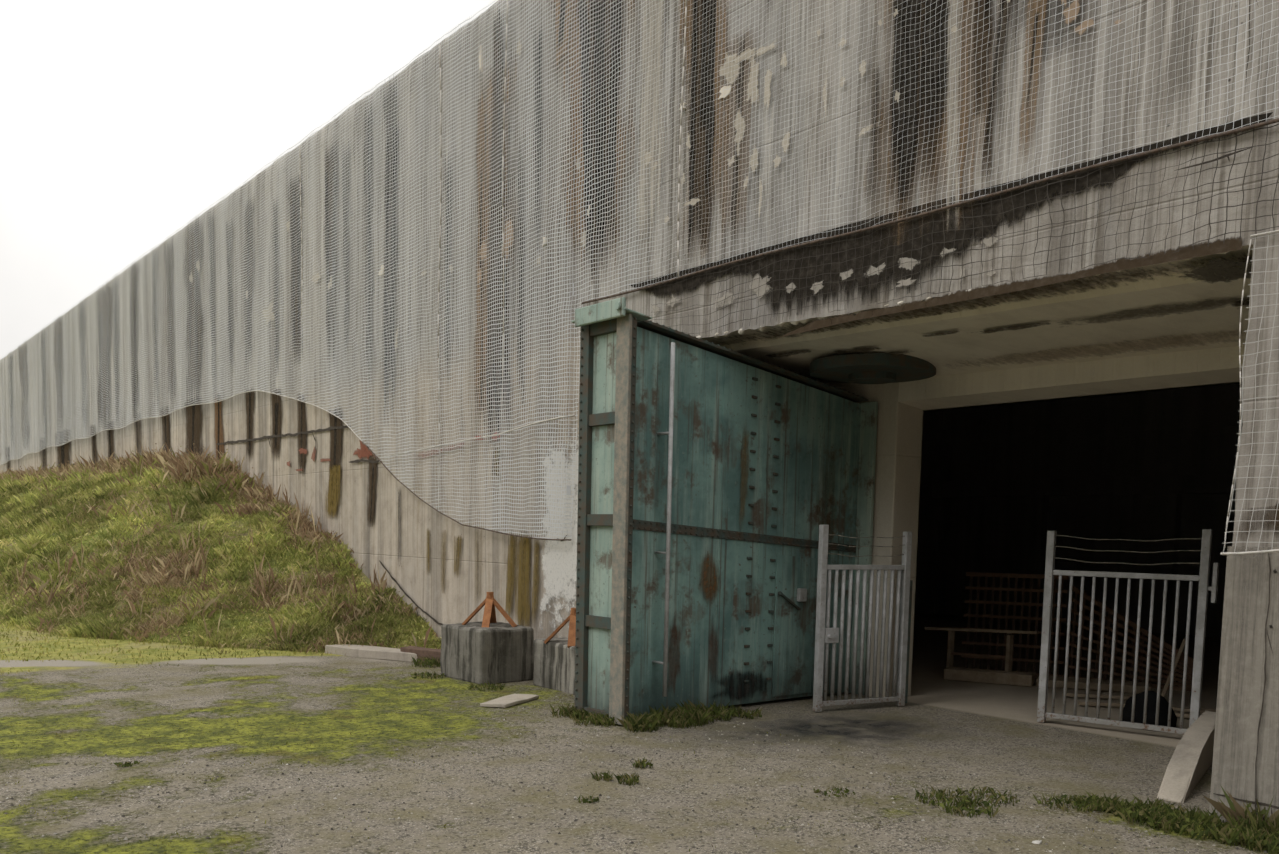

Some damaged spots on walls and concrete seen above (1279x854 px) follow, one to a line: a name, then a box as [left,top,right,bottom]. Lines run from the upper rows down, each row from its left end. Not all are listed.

water stain [474,0,664,435]
peeling [718,42,787,218]
water stain [631,0,1273,345]
water stain [325,409,342,518]
water stain [505,531,539,626]
corrosion [700,554,718,600]
corrosion [714,672,767,700]
crack [1213,553,1279,815]